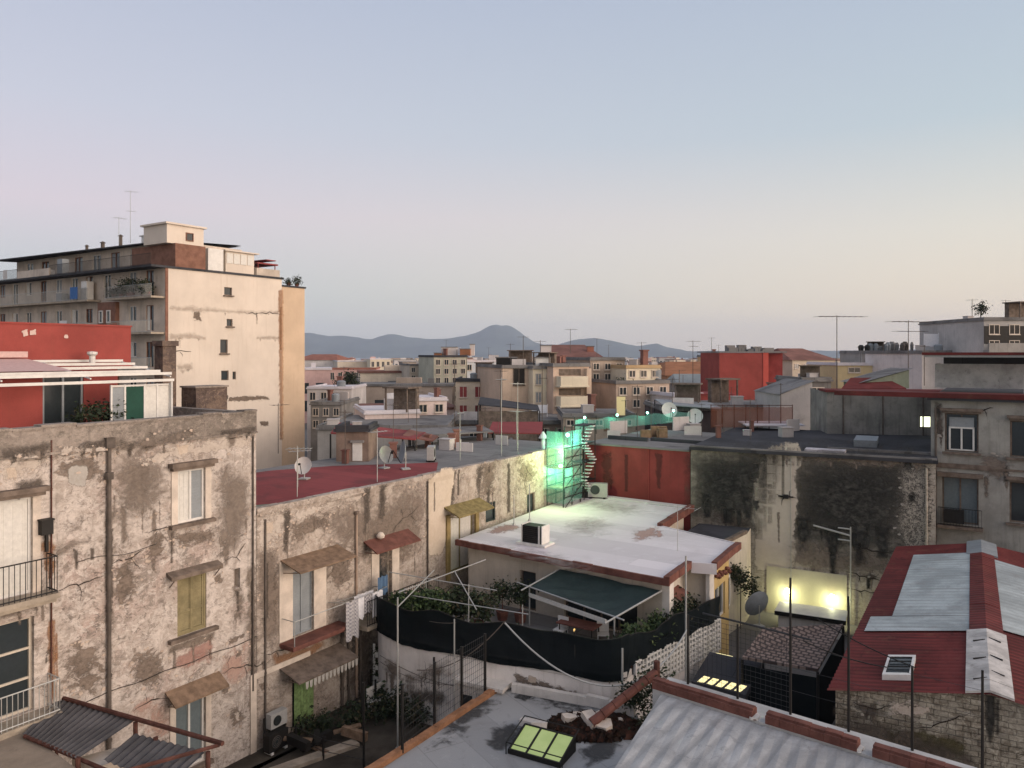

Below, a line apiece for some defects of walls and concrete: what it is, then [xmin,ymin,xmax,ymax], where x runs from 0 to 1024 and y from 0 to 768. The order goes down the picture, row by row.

spalling [0,445,108,487]
crack [59,527,169,601]
water stain [56,429,195,608]
water stain [216,426,256,565]
water stain [691,447,923,588]